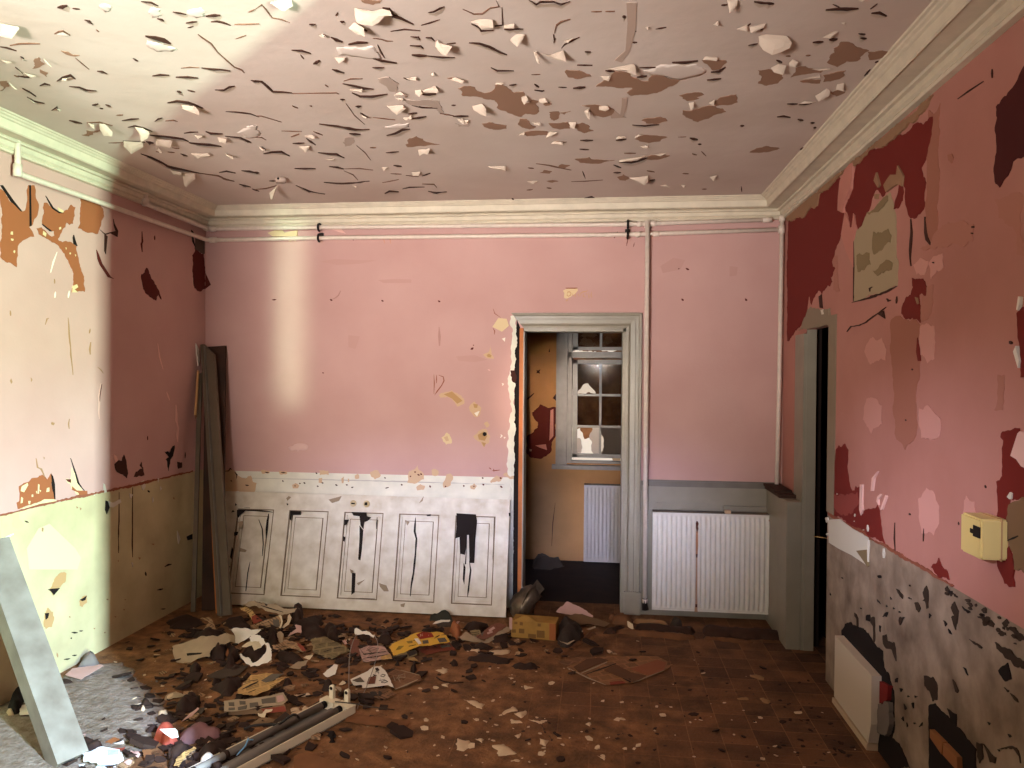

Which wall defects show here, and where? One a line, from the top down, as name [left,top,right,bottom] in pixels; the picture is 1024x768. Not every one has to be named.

peeling [349,0,392,37]
peeling [450,77,615,145]
peeling [533,38,737,122]
peeling [737,22,887,104]
peeling [993,66,1024,187]
peeling [0,185,104,292]
peeling [787,117,933,341]
spalling [352,512,371,560]
crack [409,517,417,596]
spalling [455,513,477,597]
peeling [828,444,885,566]
peeling [996,428,1024,587]